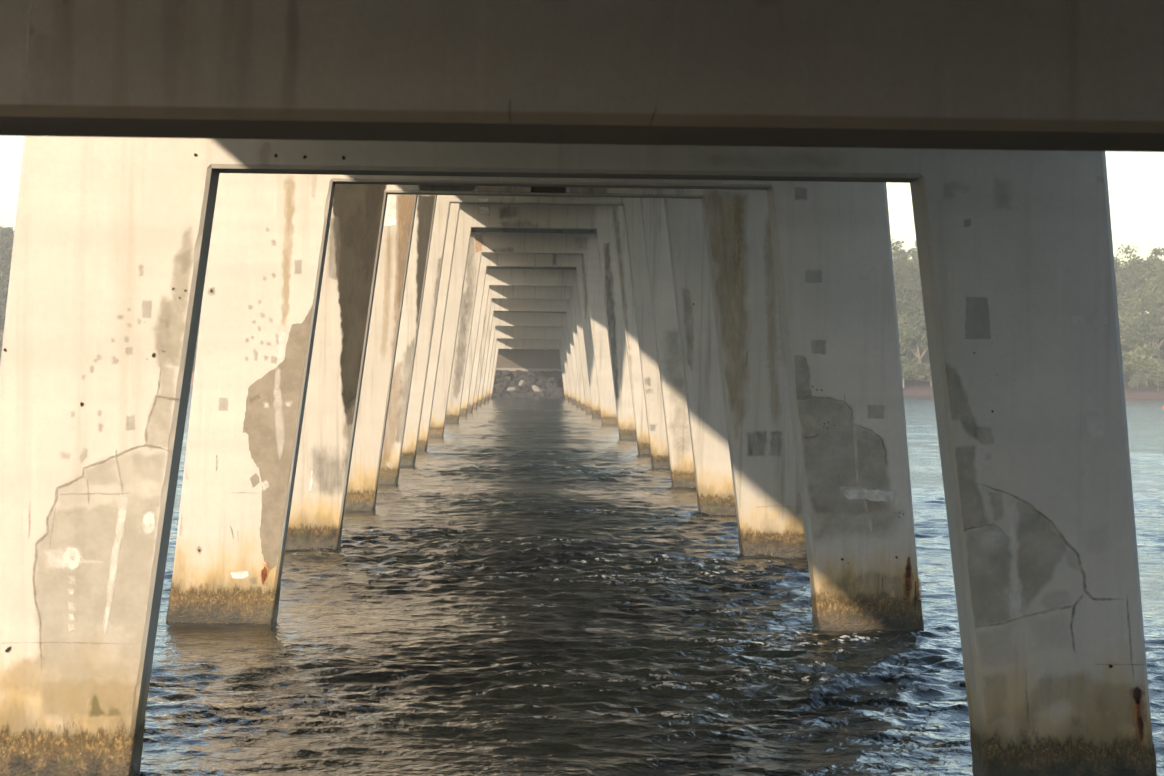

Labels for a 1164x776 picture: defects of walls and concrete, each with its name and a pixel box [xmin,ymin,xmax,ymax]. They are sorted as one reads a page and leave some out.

peeling [243,307,312,570]
rust [905,557,922,606]
crack [1070,546,1111,649]
rust [1133,687,1143,740]